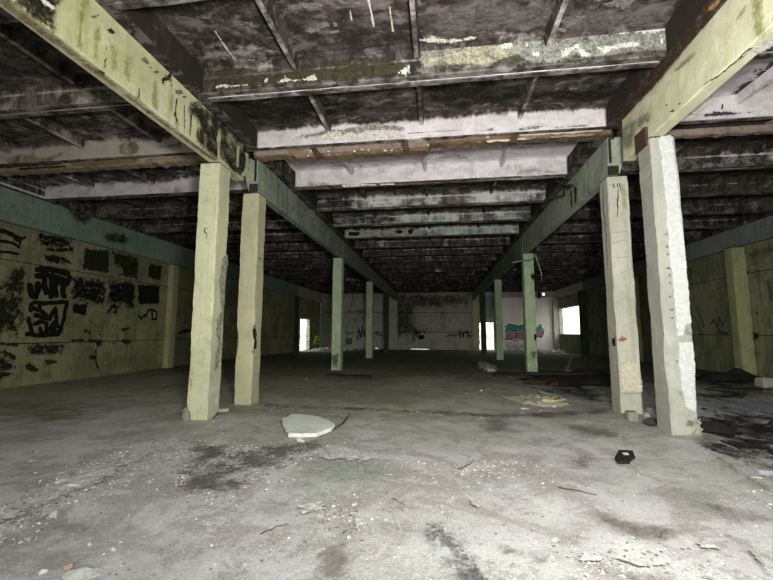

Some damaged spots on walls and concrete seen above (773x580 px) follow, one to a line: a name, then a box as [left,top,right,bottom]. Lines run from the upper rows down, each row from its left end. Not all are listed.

leakage [0,0,115,86]
efflorescence [264,74,317,83]
leakage [421,30,667,70]
leakage [126,95,221,160]
peeling [659,135,697,427]